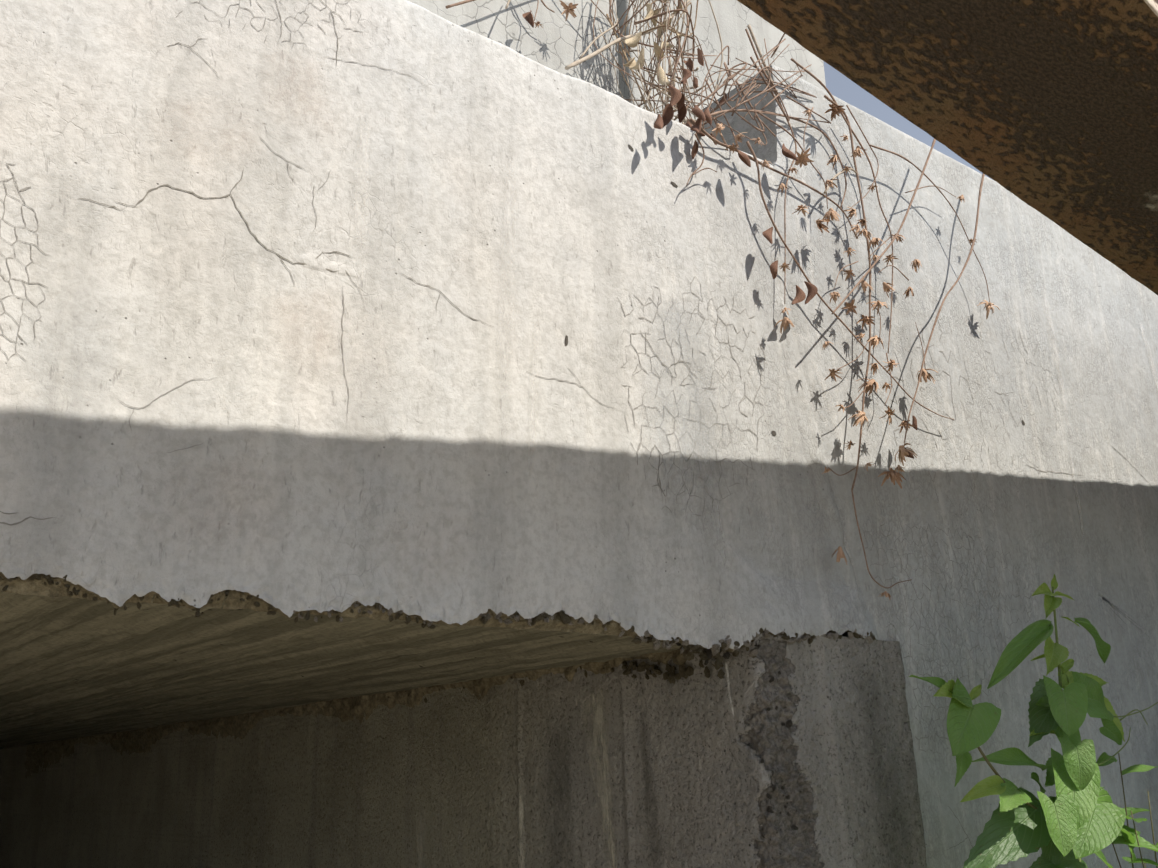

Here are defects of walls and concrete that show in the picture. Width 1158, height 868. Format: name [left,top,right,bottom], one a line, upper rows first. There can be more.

crack [168,0,427,86]
crack [0,161,48,362]
crack [79,135,365,432]
crack [401,273,491,326]
crack [526,277,770,516]
flaking render [0,573,278,617]
flaking render [292,601,438,629]
spalling [464,610,875,868]